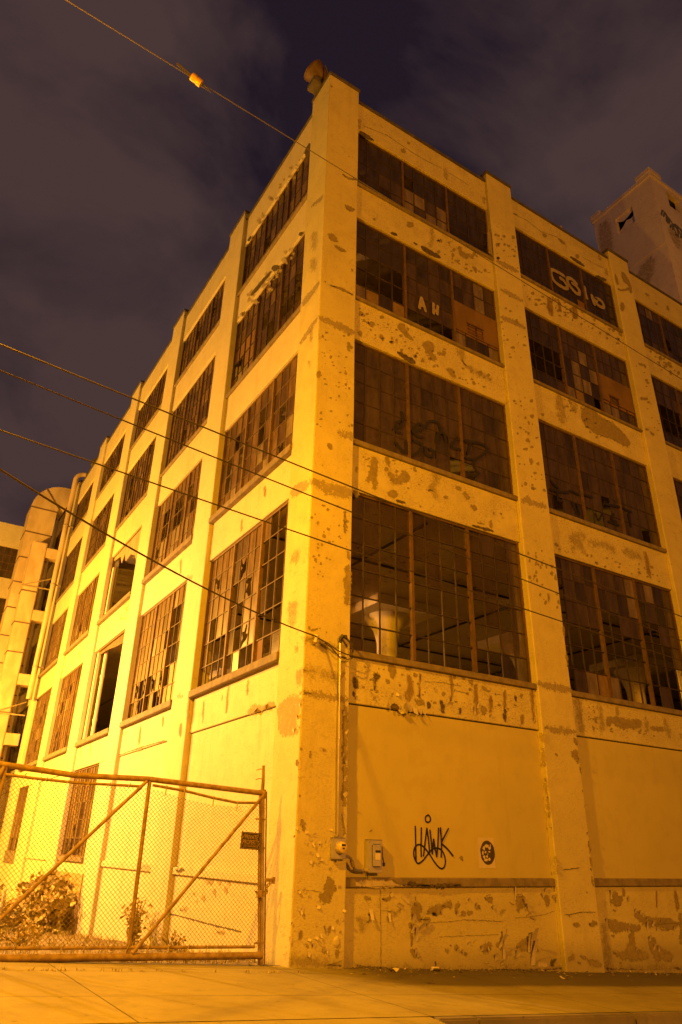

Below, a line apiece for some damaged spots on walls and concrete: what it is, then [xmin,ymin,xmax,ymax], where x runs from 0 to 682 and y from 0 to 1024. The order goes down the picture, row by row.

spalling [268,143,310,201]
peeling [413,232,518,273]
spalling [237,248,295,319]
peeling [316,308,492,427]
peeling [561,398,631,448]
peeling [353,453,422,504]
peeling [443,486,502,532]
peeling [310,504,353,606]
peeling [588,706,664,736]
peeling [289,664,582,965]
peeling [568,888,682,970]